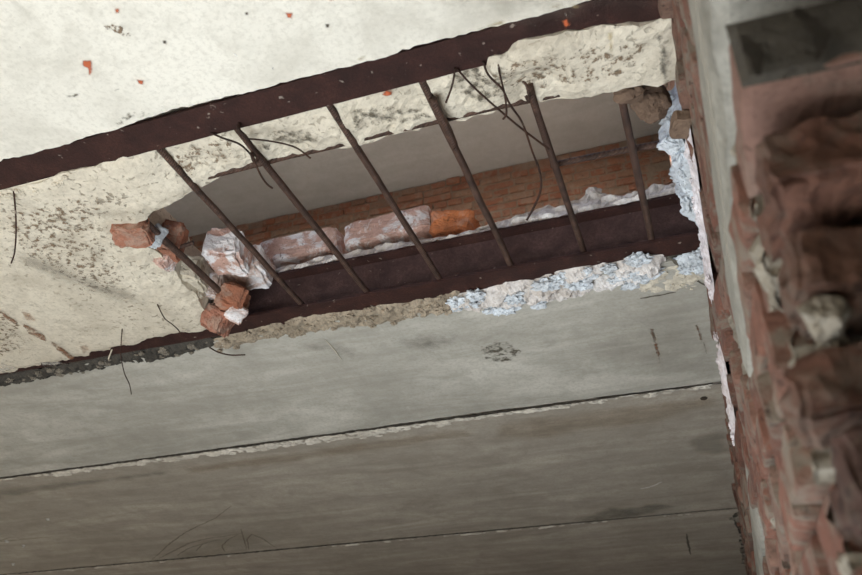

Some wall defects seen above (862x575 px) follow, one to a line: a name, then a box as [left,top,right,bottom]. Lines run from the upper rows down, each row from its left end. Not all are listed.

spalling [0,175,69,201]
spalling [0,218,460,386]
peeling [639,266,705,293]
rust [1,312,74,360]
water stain [485,343,520,361]
crack [0,383,721,479]
crack [1,506,737,575]